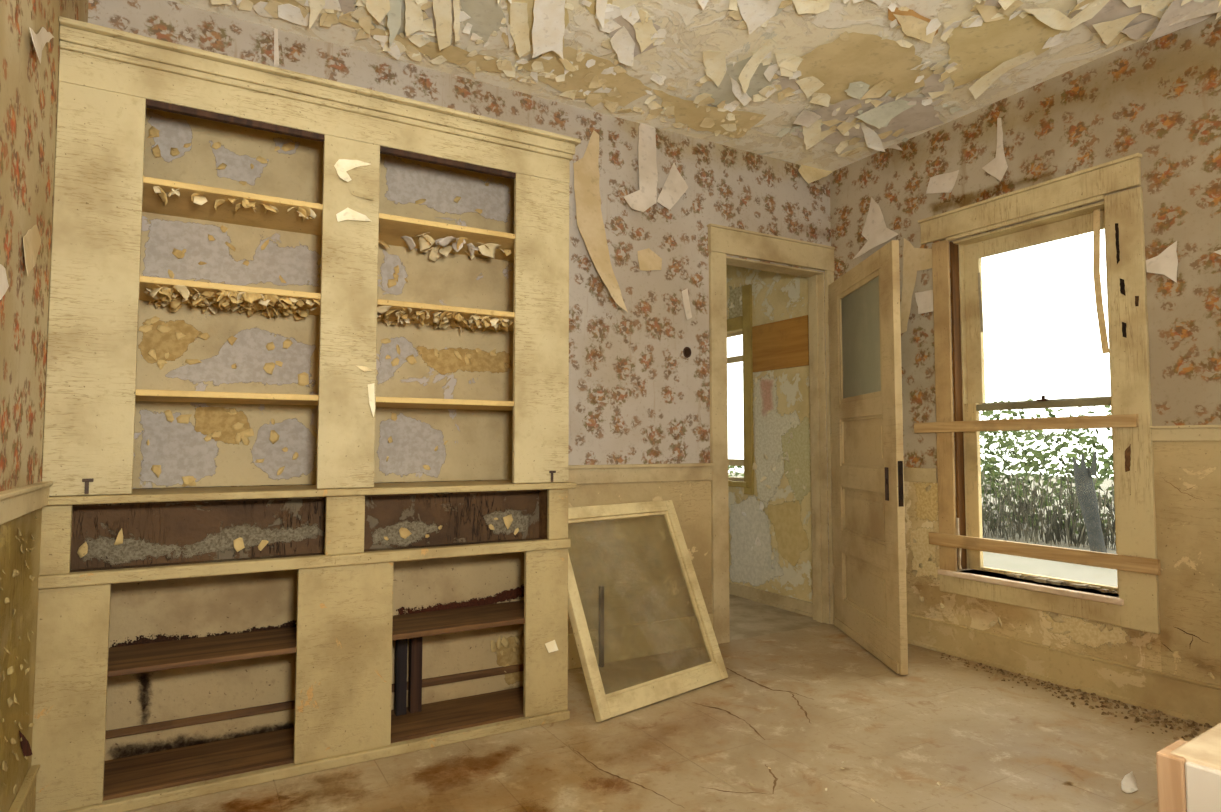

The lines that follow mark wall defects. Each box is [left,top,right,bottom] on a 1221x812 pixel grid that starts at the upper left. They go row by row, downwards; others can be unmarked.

peeling [211,0,1221,157]
peeling [148,110,193,162]
peeling [334,155,511,223]
peeling [138,138,321,387]
peeling [356,232,513,478]
peeling [139,406,317,487]
peeling [729,374,809,586]
peeling [77,522,320,565]
crack [725,667,814,724]
crack [569,702,778,808]